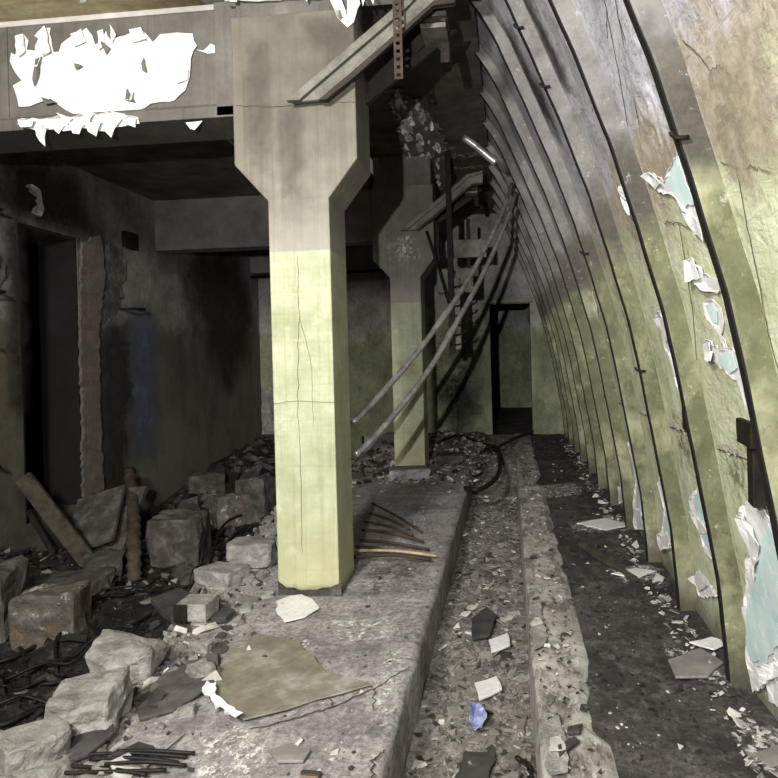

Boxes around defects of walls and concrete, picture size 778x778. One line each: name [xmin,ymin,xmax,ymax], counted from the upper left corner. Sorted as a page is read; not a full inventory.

peeling [330,0,374,27]
peeling [10,25,215,146]
crack [683,41,728,77]
peeling [617,184,632,218]
peeling [640,152,703,241]
peeling [653,307,679,392]
peeling [683,258,748,411]
peeling [617,441,643,530]
peeling [657,477,671,551]
peeling [689,488,712,560]
peeling [688,570,717,599]
peeling [734,501,778,707]